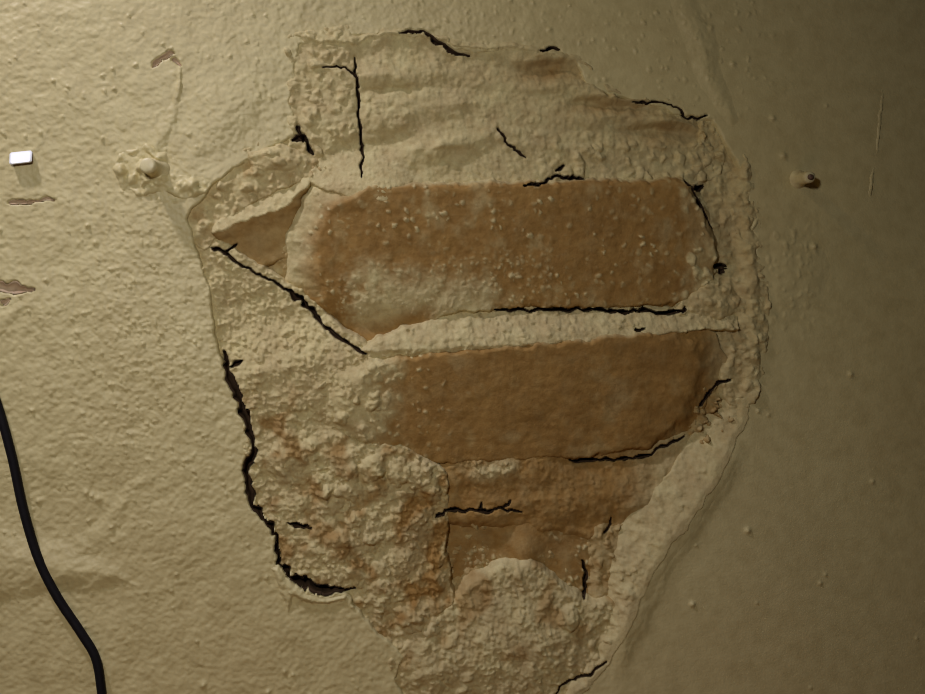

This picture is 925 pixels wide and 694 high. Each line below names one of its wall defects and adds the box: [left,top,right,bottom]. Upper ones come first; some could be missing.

crack [399,30,470,57]
flaking render [152,51,181,68]
crack [322,57,364,178]
crack [632,101,707,120]
crack [497,128,526,158]
crack [523,165,584,187]
crack [211,244,366,355]
crack [494,306,686,332]
flaking render [188,24,772,694]
crack [570,435,685,463]
crack [223,350,356,596]
crack [556,661,607,694]